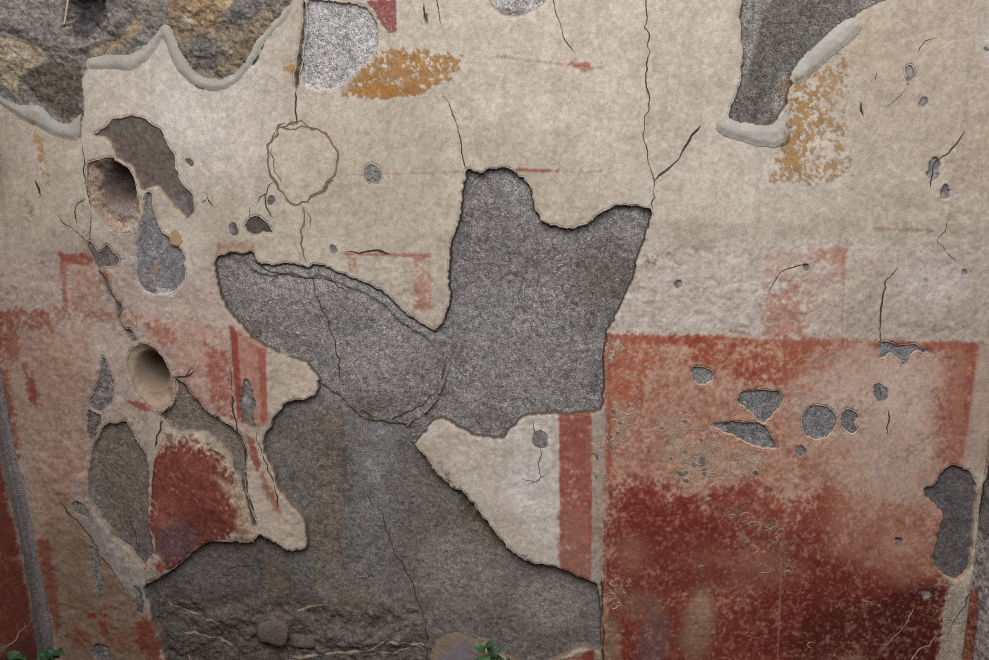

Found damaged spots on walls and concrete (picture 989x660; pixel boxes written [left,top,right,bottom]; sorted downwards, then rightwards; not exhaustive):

flaking render [0,0,380,297]
flaking render [487,0,548,19]
crack [642,0,701,207]
flaking render [727,0,888,125]
flaking render [904,63,917,85]
crack [249,92,348,376]
crack [349,247,390,255]
flaking render [72,355,155,569]
flaking render [86,166,653,660]
crack [352,348,451,420]
flaking render [796,404,860,456]
flaking render [922,464,989,583]